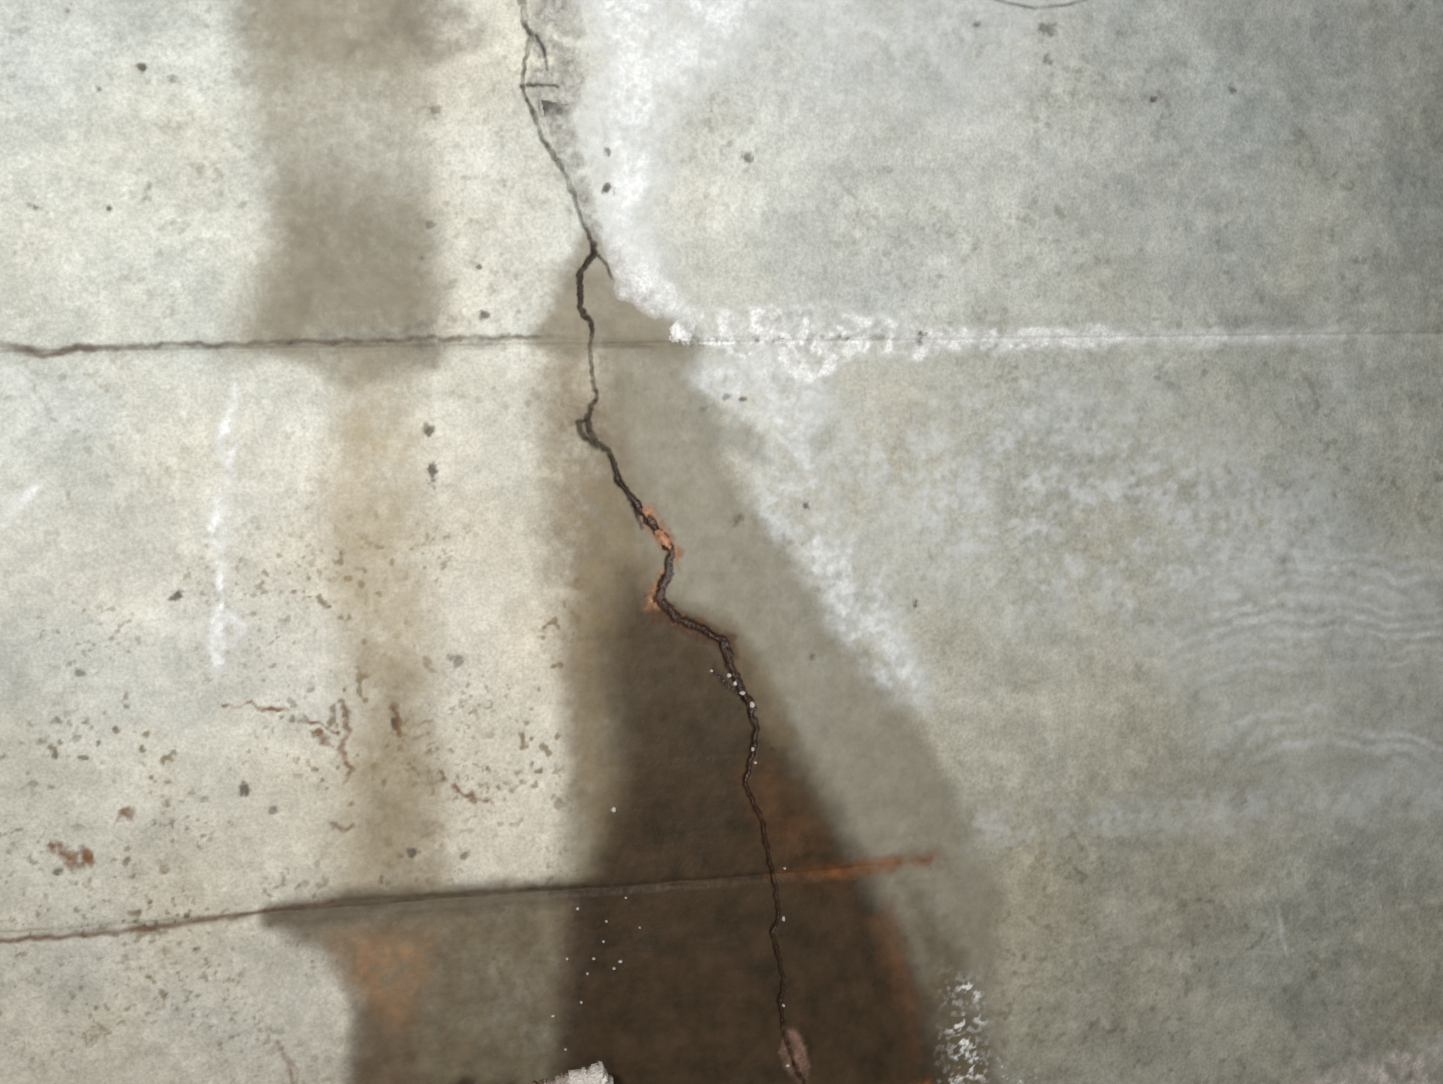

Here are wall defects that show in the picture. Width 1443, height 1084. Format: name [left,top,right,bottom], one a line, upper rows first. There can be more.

crack [521,23,558,160]
crack [15,344,116,357]
crack [155,340,222,348]
crack [278,335,543,345]
water stain [249,0,1305,1084]
water stain [1024,440,1438,666]
crack [572,192,779,957]
crack [214,902,332,919]
crack [0,924,179,942]